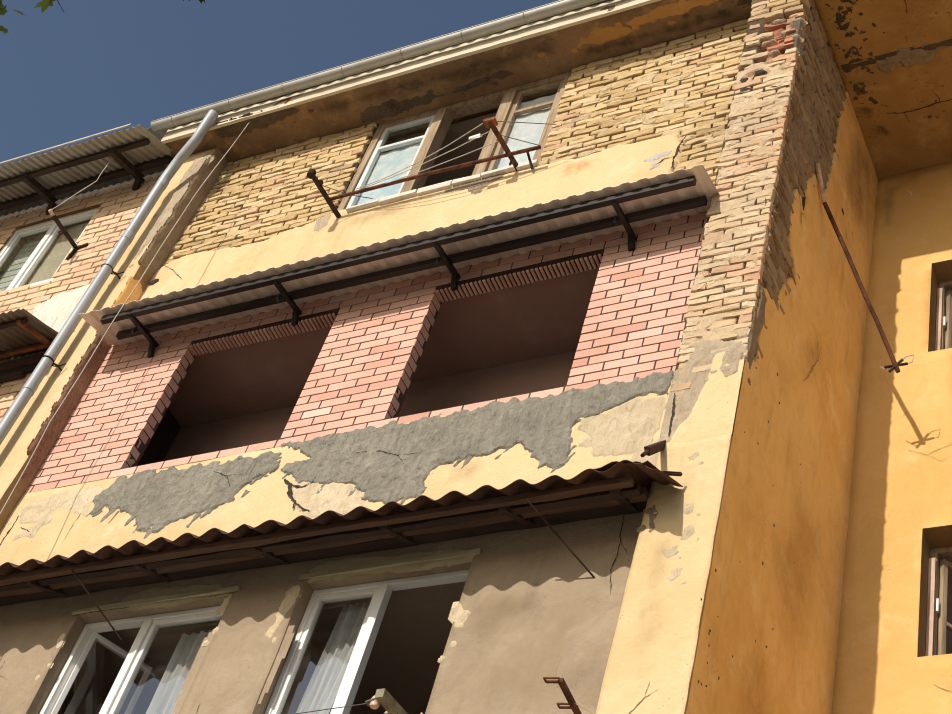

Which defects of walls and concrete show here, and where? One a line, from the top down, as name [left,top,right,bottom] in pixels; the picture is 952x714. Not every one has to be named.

crack [887,97,952,123]
flaking render [710,0,885,385]
flaking render [21,331,112,480]
peeling [577,396,667,467]
peeling [13,486,105,541]
flaking render [291,481,368,518]
crack [610,516,627,592]
flaking render [636,505,658,533]